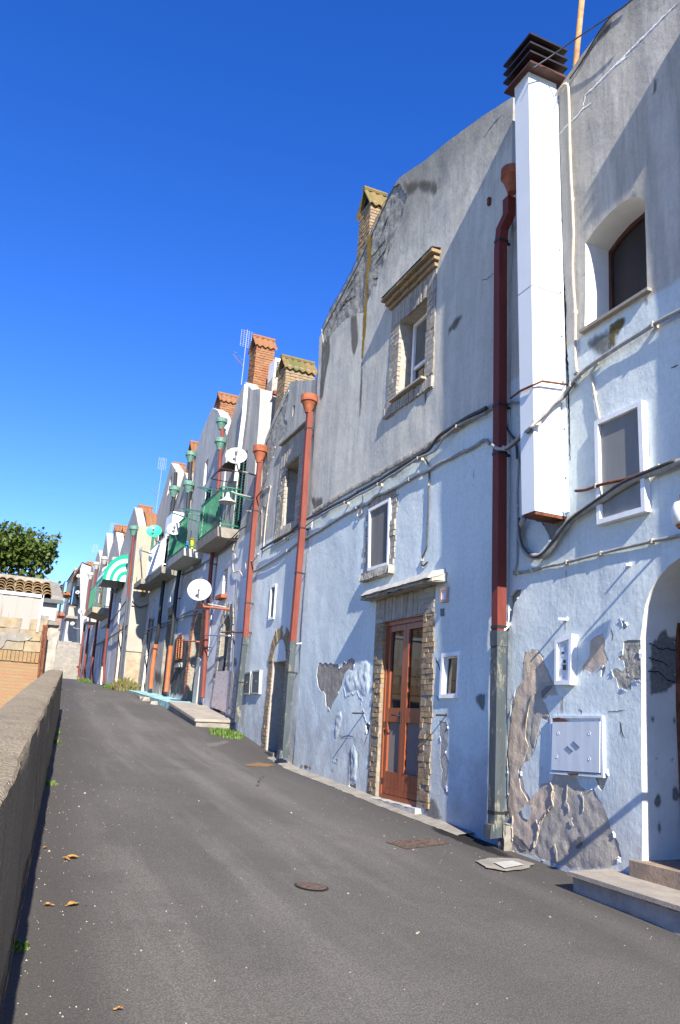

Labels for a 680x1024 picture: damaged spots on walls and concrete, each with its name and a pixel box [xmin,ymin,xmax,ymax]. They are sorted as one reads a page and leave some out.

spalling [582,618,676,694]
spalling [317,658,370,734]
spalling [506,649,622,869]